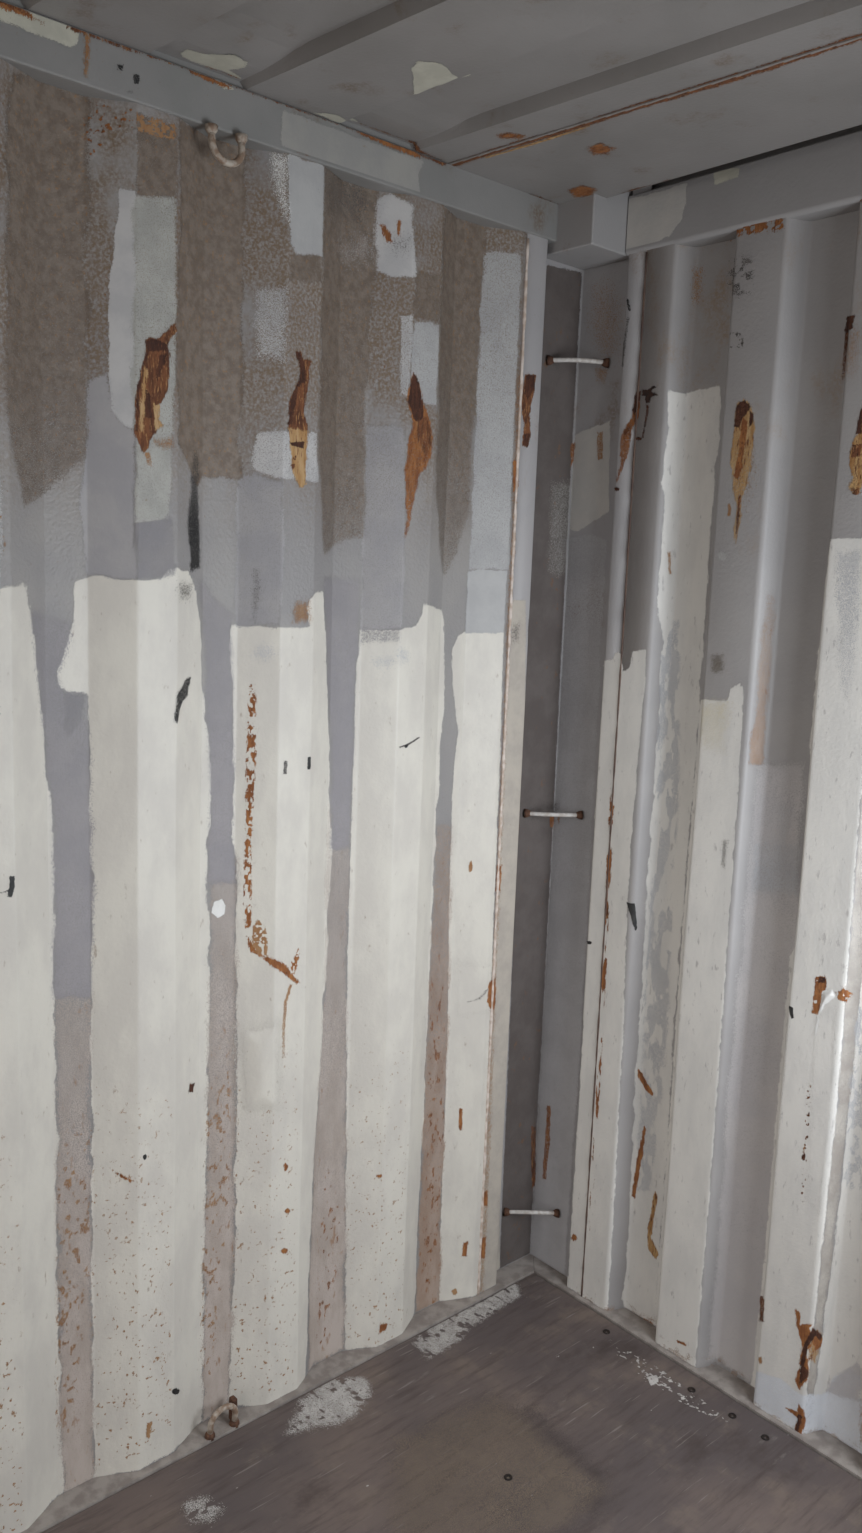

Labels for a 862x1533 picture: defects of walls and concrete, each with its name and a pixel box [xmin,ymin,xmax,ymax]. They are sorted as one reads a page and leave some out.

corrosion [133,323,177,467]
corrosion [288,351,312,488]
corrosion [403,372,434,538]
corrosion [597,386,658,491]
corrosion [727,399,759,543]
corrosion [848,408,862,495]
corrosion [462,354,561,1291]
corrosion [188,685,473,1422]
corrosion [812,975,852,1037]
corrosion [51,961,180,1492]
corrosion [632,1126,658,1259]
corrosion [785,1308,823,1434]